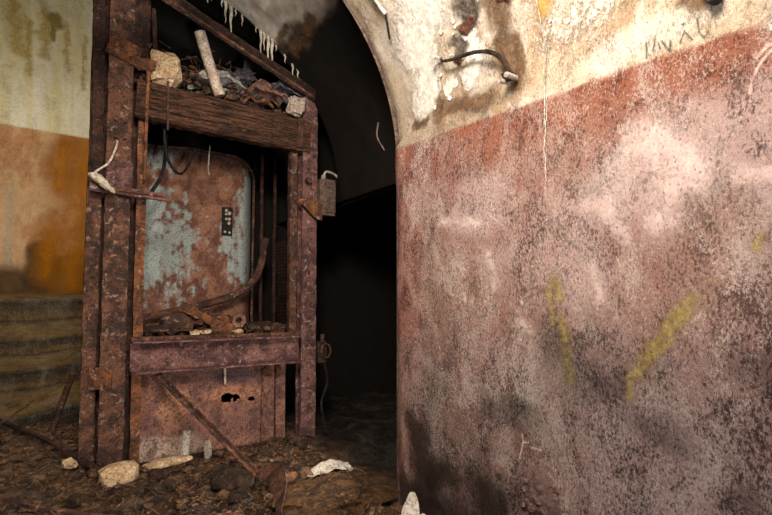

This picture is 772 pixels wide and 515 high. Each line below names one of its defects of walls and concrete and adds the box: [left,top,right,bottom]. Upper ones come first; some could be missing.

water stain [7,1,70,73]
peeling [391,0,486,122]
water stain [0,240,83,294]
water stain [400,411,467,515]
water stain [468,475,508,515]